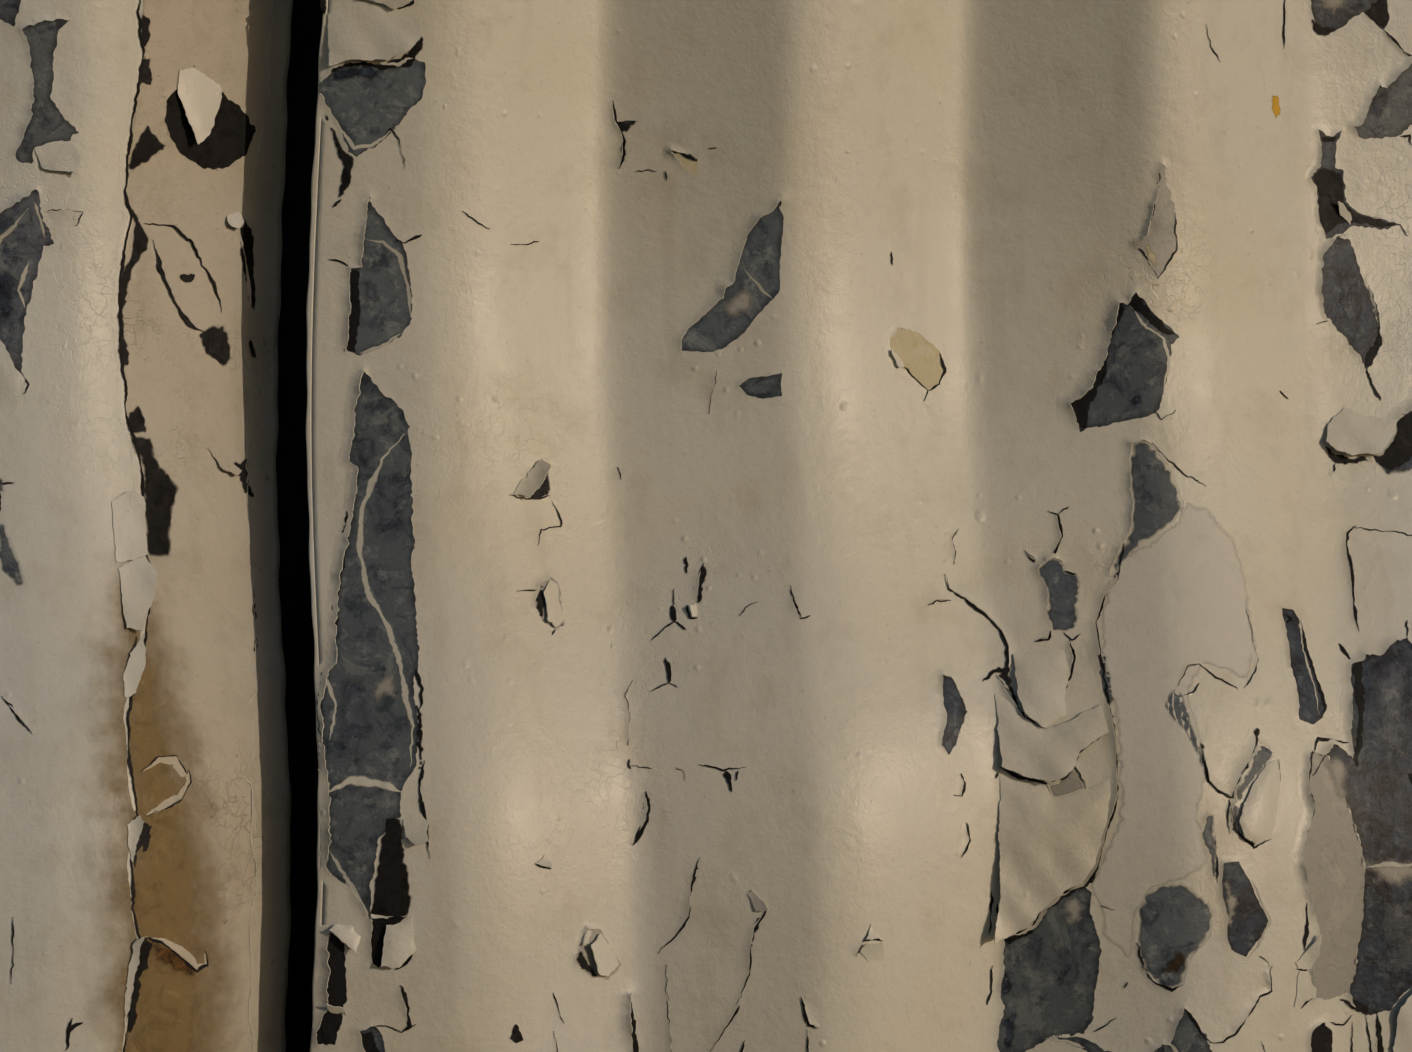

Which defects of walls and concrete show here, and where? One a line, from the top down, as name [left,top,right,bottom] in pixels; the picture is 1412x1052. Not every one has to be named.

peeling [0,0,89,426]
peeling [155,65,264,180]
peeling [312,0,436,1052]
peeling [666,184,797,406]
peeling [882,319,951,401]
peeling [1024,155,1192,645]
crack [1153,443,1206,486]
peeling [1302,0,1412,489]
crack [655,856,769,1052]
crack [801,995,821,1052]
crack [922,529,1124,891]
peeling [987,598,1412,1052]